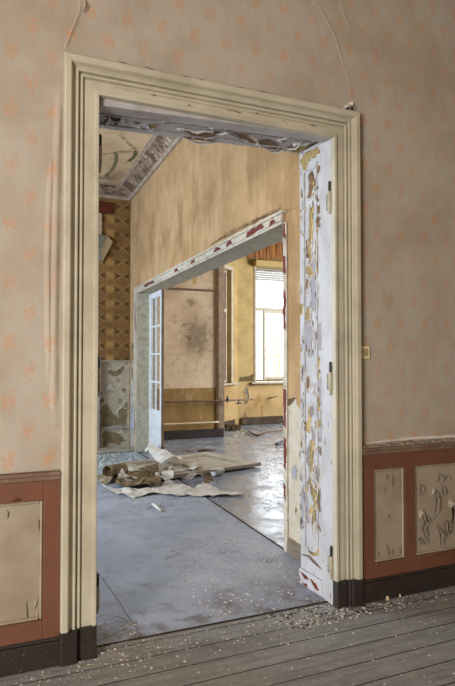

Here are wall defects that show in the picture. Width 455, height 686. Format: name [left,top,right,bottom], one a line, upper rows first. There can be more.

flaking render [100,116,324,570]